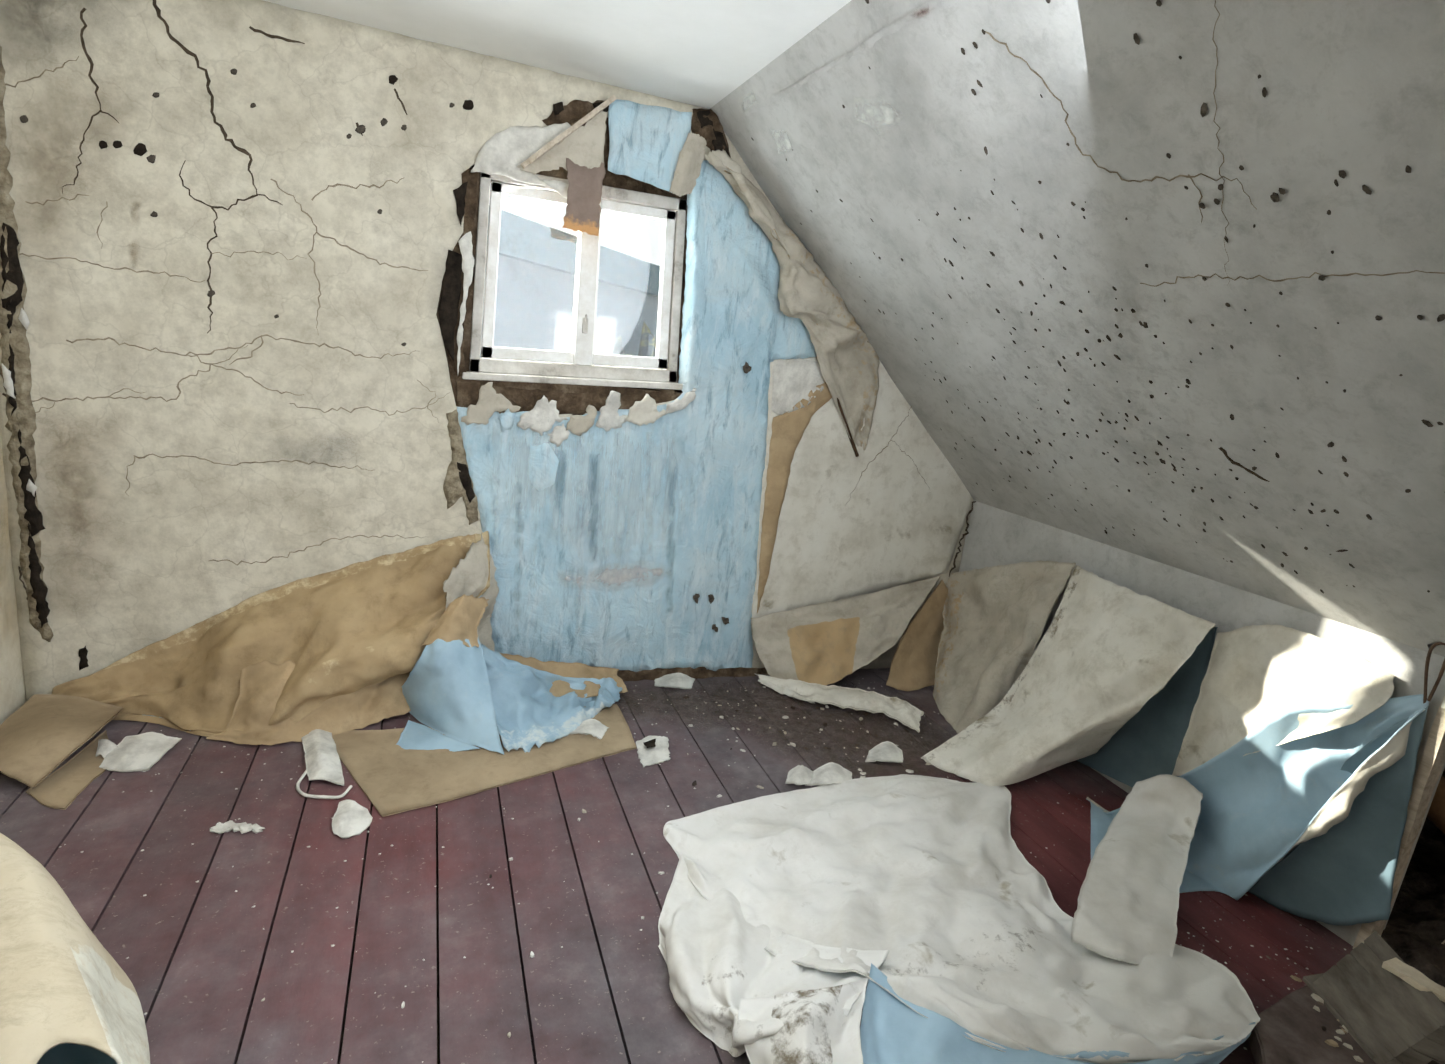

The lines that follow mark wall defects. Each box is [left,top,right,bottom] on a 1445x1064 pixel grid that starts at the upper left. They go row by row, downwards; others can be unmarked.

spalling [0,46,54,642]
crack [2,0,450,423]
crack [125,454,375,494]
spalling [438,100,678,525]
spalling [691,108,731,158]
spalling [617,667,842,756]